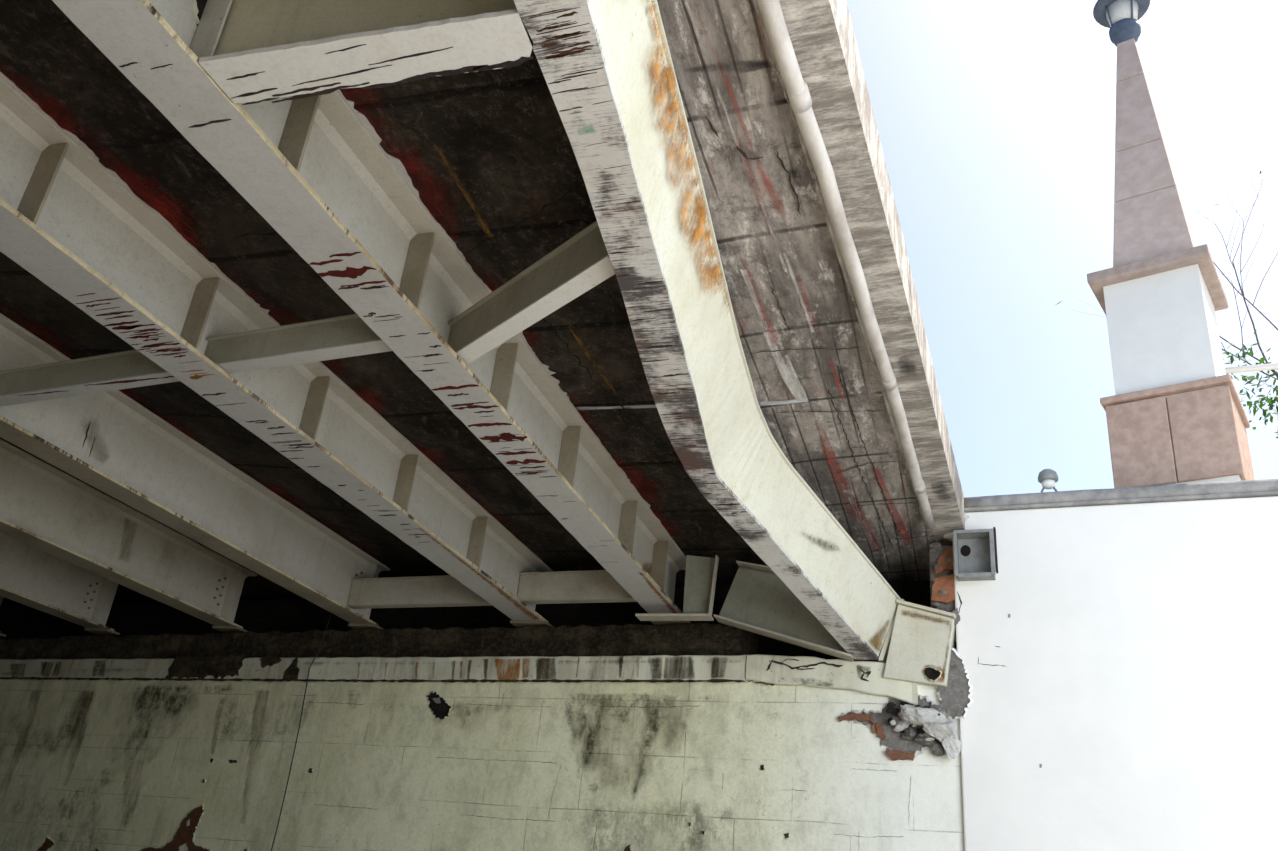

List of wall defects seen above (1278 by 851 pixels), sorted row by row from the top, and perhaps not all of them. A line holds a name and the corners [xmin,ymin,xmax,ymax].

crack [706,117,801,214]
crack [747,656,871,686]
water stain [137,686,187,740]
hole [427,690,452,720]
water stain [569,695,610,763]
water stain [621,695,659,793]
spalling [838,695,961,761]
peeling [37,836,54,851]
peeling [140,803,211,851]